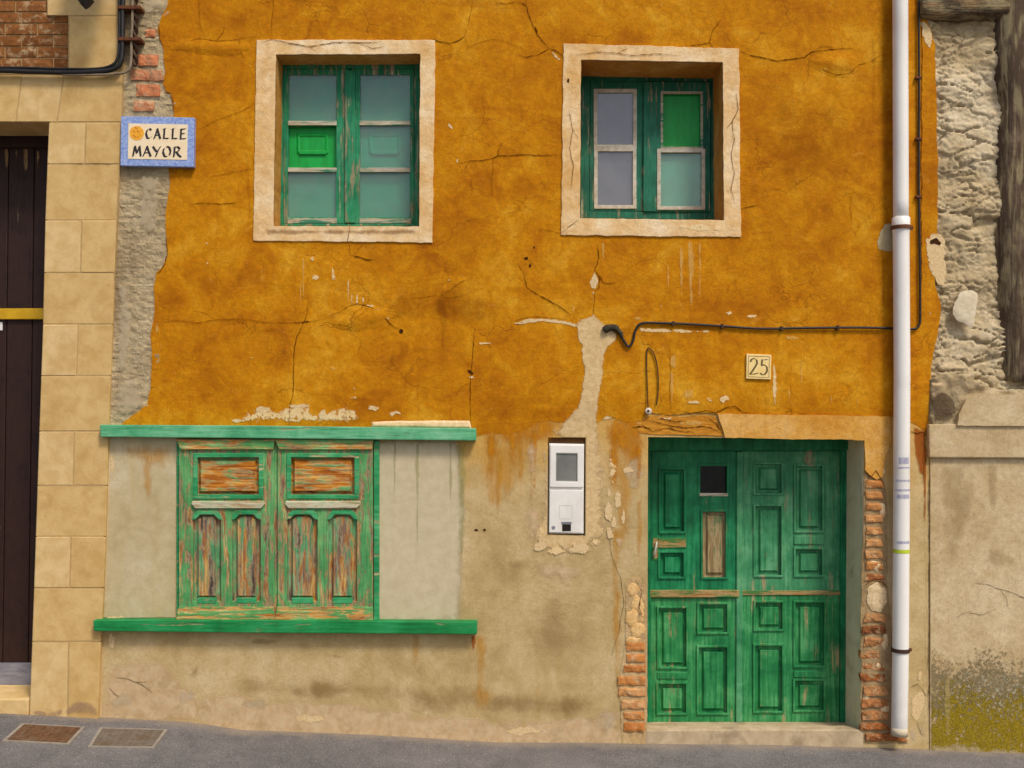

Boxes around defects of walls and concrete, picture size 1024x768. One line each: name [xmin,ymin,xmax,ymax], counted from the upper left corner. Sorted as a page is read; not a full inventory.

spalling [123,0,176,117]
crack [433,1,720,57]
crack [740,46,891,75]
crack [463,112,578,186]
spalling [110,166,172,425]
peeling [514,319,578,327]
crack [515,251,611,321]
spalling [926,233,947,285]
peeling [232,388,358,423]
spalling [858,469,908,744]
spalling [618,574,648,744]
damp [931,650,1024,734]